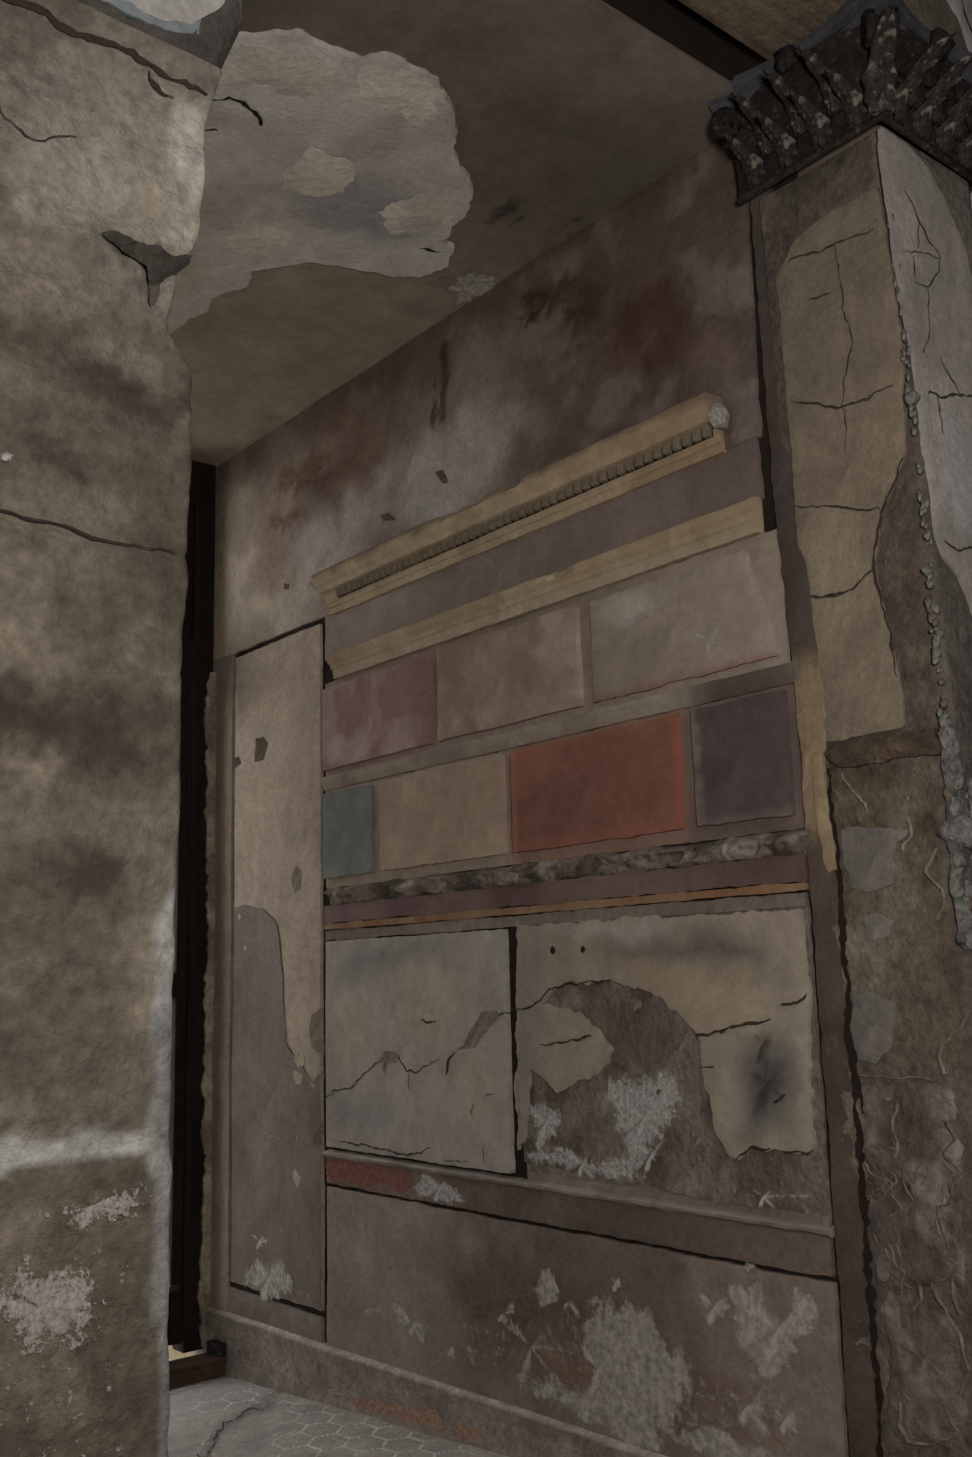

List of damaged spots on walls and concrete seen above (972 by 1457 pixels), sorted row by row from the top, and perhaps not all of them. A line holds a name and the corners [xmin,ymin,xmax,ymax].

peeling [101,0,225,34]
peeling [101,28,473,333]
crack [787,228,893,450]
crack [904,191,972,433]
crack [795,457,904,676]
leakage [0,1246,105,1374]
leakage [45,1184,151,1229]
spalling [231,905,325,1309]
crack [324,1052,455,1099]
crack [339,1093,495,1163]
spalling [523,980,824,1216]
spalling [850,990,972,1450]